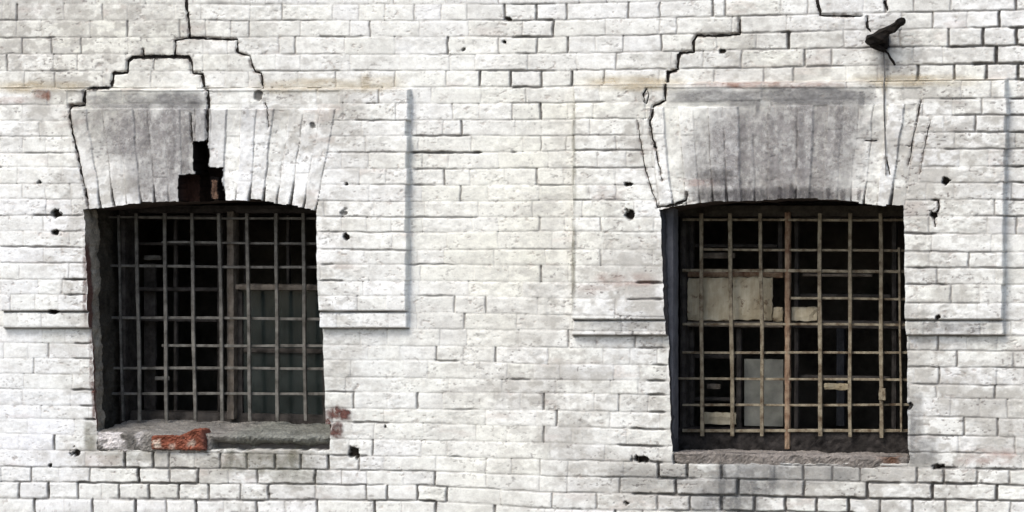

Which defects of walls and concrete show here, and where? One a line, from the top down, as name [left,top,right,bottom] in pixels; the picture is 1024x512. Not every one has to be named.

crack [816,0,888,32]
crack [69,0,269,198]
crack [638,19,741,208]
crack [865,102,930,174]
spalling [199,142,226,202]
spalling [151,428,211,451]
peeling [325,406,350,438]